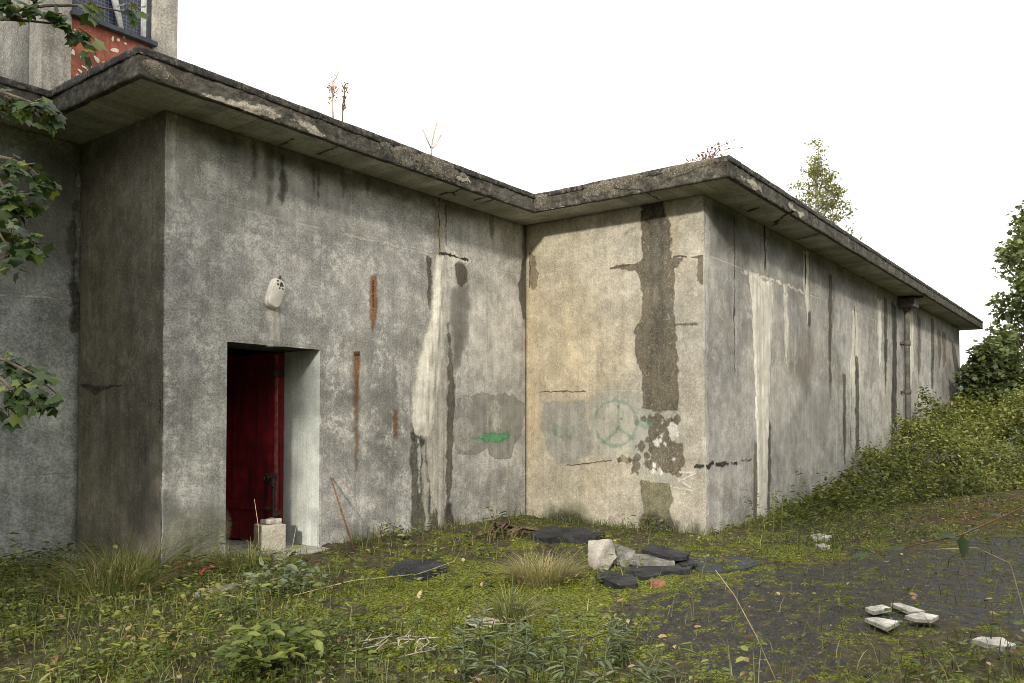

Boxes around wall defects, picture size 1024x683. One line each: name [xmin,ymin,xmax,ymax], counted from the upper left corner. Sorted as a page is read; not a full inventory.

crack [438,189,498,261]
damp [167,118,501,532]
damp [610,201,811,519]
damp [828,275,897,462]
peeling [566,413,685,477]
crack [694,458,752,469]
damp [640,480,677,532]